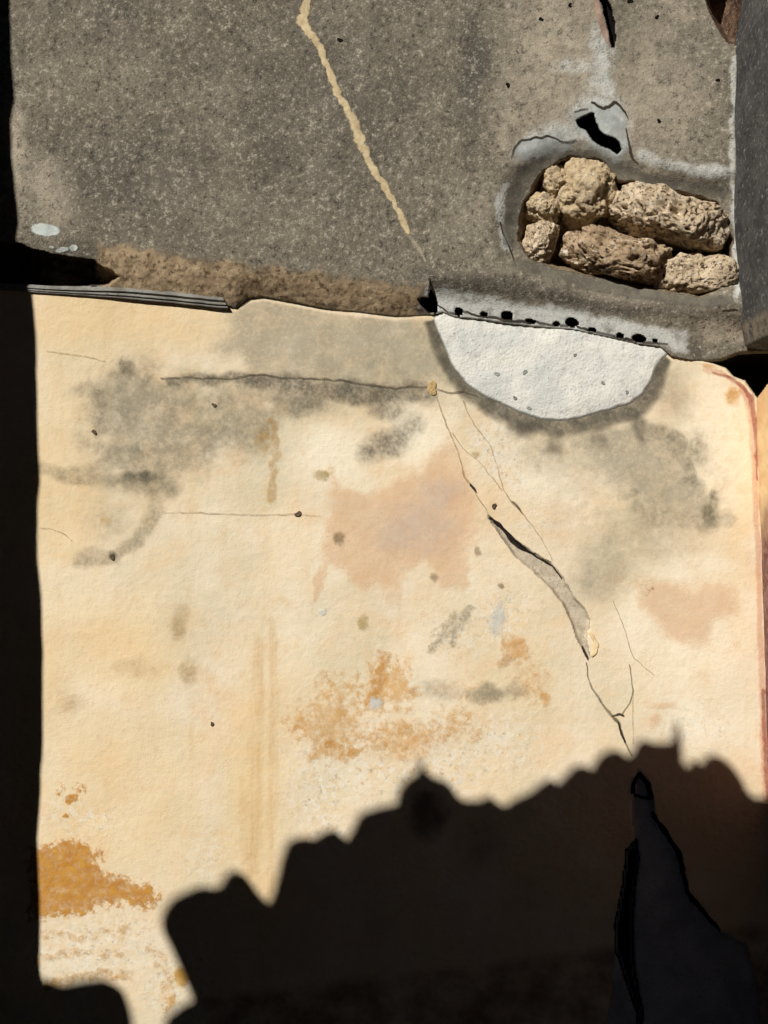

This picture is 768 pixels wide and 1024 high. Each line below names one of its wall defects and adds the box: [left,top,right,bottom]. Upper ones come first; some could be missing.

peeling [0,241,437,316]
crack [296,0,427,262]
flaking render [503,101,739,306]
damp [107,396,268,478]
crack [160,373,477,396]
crack [487,501,633,746]